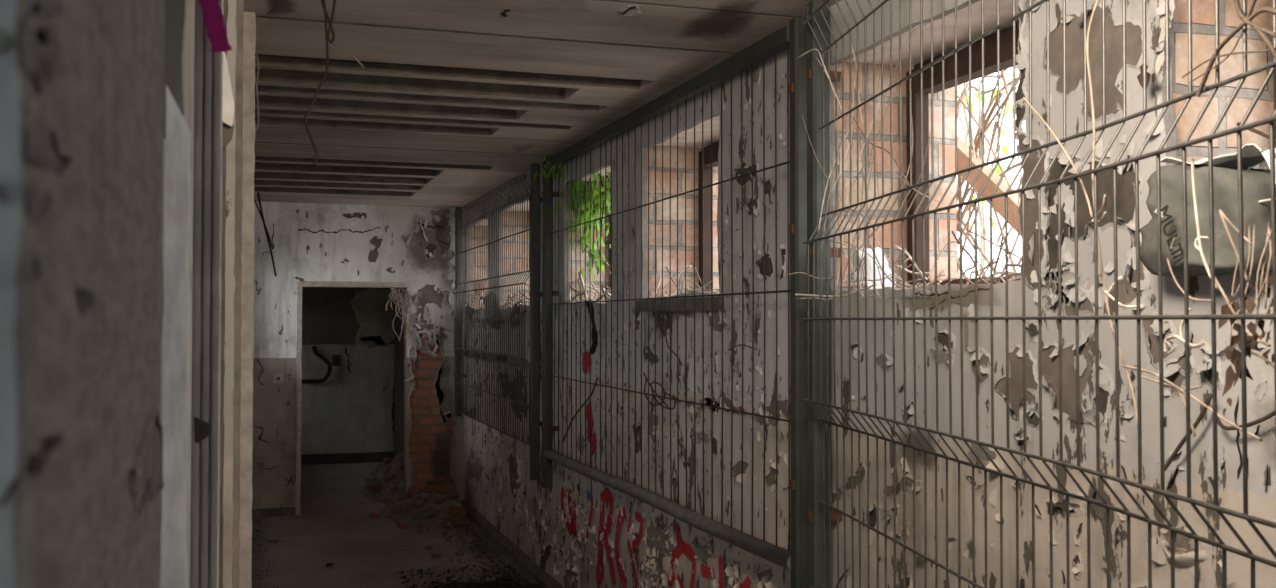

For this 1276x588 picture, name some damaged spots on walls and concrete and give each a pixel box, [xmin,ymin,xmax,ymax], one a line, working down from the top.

crack [261,223,381,259]
peeling [341,211,368,220]
peeling [928,0,1239,446]
peeling [561,64,791,526]
flaking render [349,207,527,489]
peeling [1165,449,1185,487]
peeling [1206,446,1226,494]
peeling [1263,463,1271,491]
peeling [539,467,680,588]
peeling [948,538,990,588]
peeling [1028,490,1126,586]